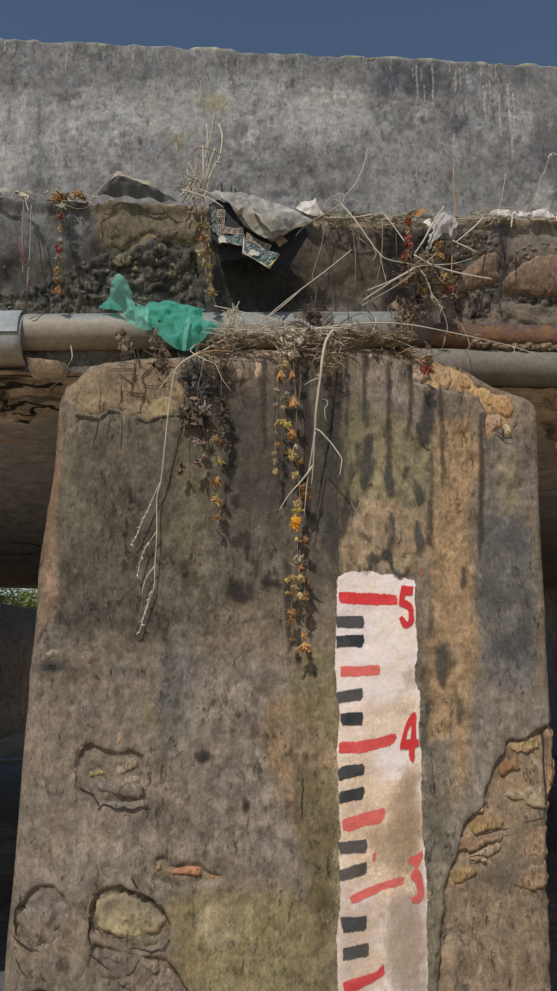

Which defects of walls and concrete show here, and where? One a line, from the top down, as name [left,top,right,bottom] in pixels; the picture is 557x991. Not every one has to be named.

peeling [0,357,191,424]
water stain [214,353,432,558]
water stain [408,364,445,483]
peeling [412,359,514,440]
water stain [478,412,520,555]
water stain [225,531,292,650]
water stain [364,512,409,580]
spalling [74,730,146,803]
spalling [439,726,555,991]
spalling [16,885,68,946]
spalling [87,886,183,991]